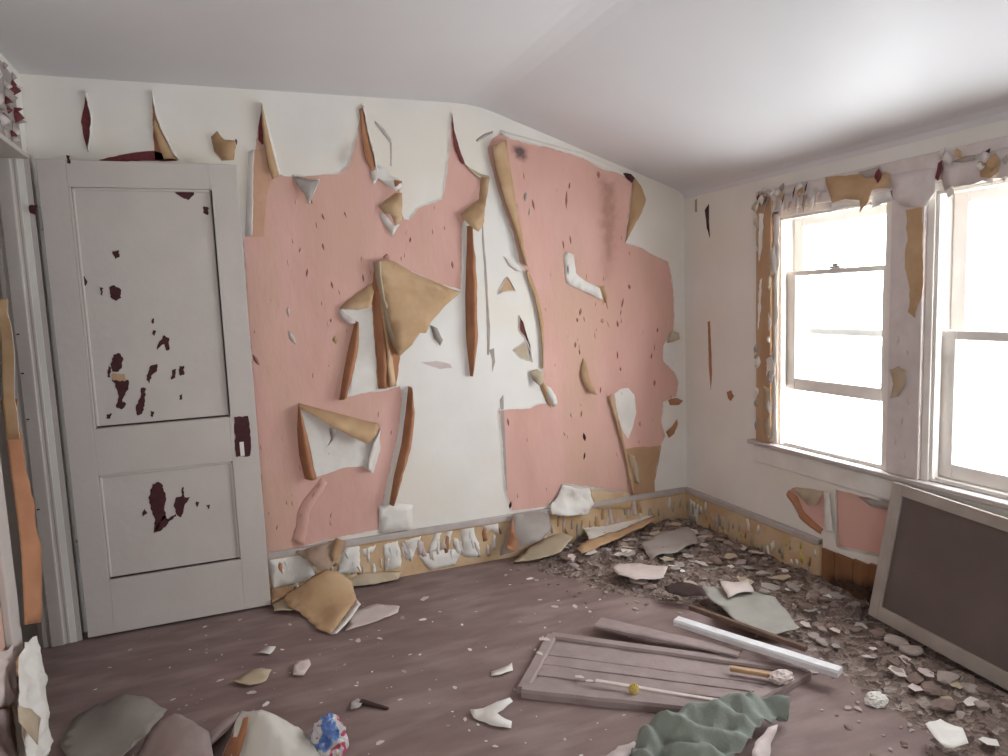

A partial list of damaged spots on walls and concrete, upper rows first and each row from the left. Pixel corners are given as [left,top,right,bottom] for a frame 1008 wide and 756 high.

peeling [825,166,893,212]
peeling [100,285,121,301]
peeling [905,207,924,318]
peeling [151,318,170,351]
peeling [234,102,816,589]
peeling [106,353,158,419]
peeling [0,299,42,625]
peeling [142,482,210,532]
peeling [834,487,890,557]